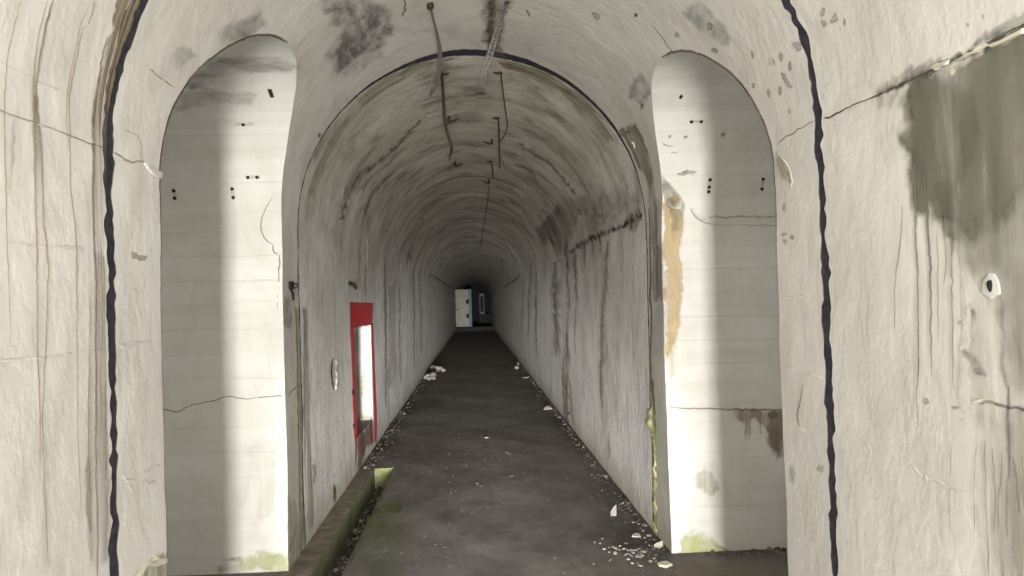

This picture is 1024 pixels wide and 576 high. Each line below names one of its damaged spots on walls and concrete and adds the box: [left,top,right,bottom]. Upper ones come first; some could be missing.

crack [0,110,163,178]
mould [335,0,382,70]
leakage [662,50,777,260]
peeling [768,54,792,95]
crack [777,24,1024,145]
leakage [899,28,1024,389]
hole [981,273,1001,298]
crack [163,385,306,555]
leakage [645,380,658,536]
corrosion [670,407,782,456]